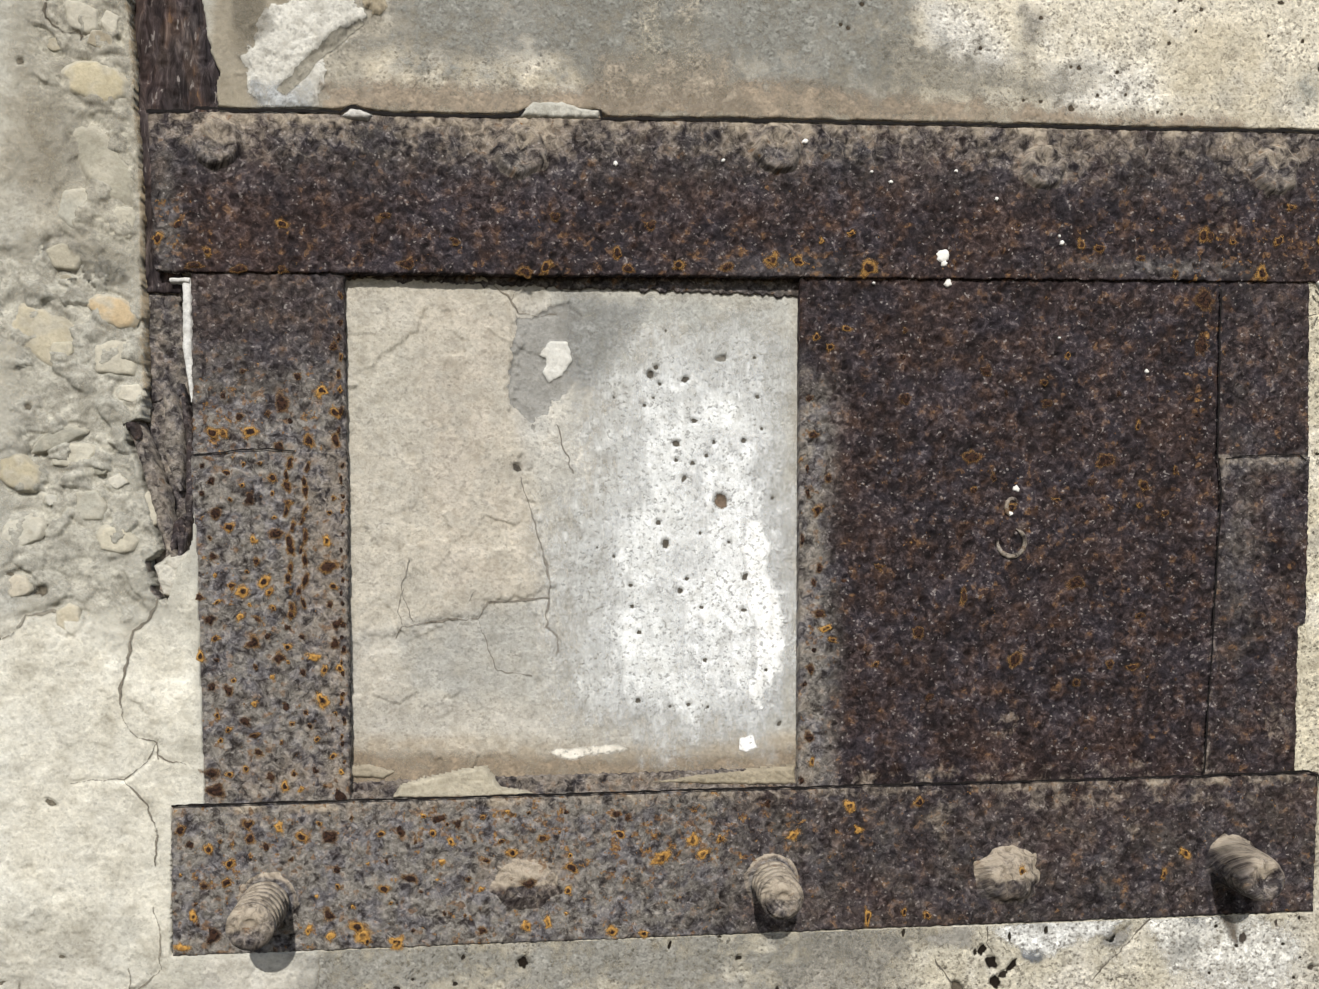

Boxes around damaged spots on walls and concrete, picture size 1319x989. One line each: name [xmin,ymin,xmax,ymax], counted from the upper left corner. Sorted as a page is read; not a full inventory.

corrosion [316,320,343,447]
crack [70,286,1319,866]
crack [2,609,82,639]
corrosion [195,432,814,800]
corrosion [802,609,837,686]
corrosion [175,825,222,855]
corrosion [242,819,337,851]
corrosion [377,813,462,881]
corrosion [844,800,863,834]
crack [127,907,162,989]
corrosion [189,858,235,944]
corrosion [305,895,370,945]